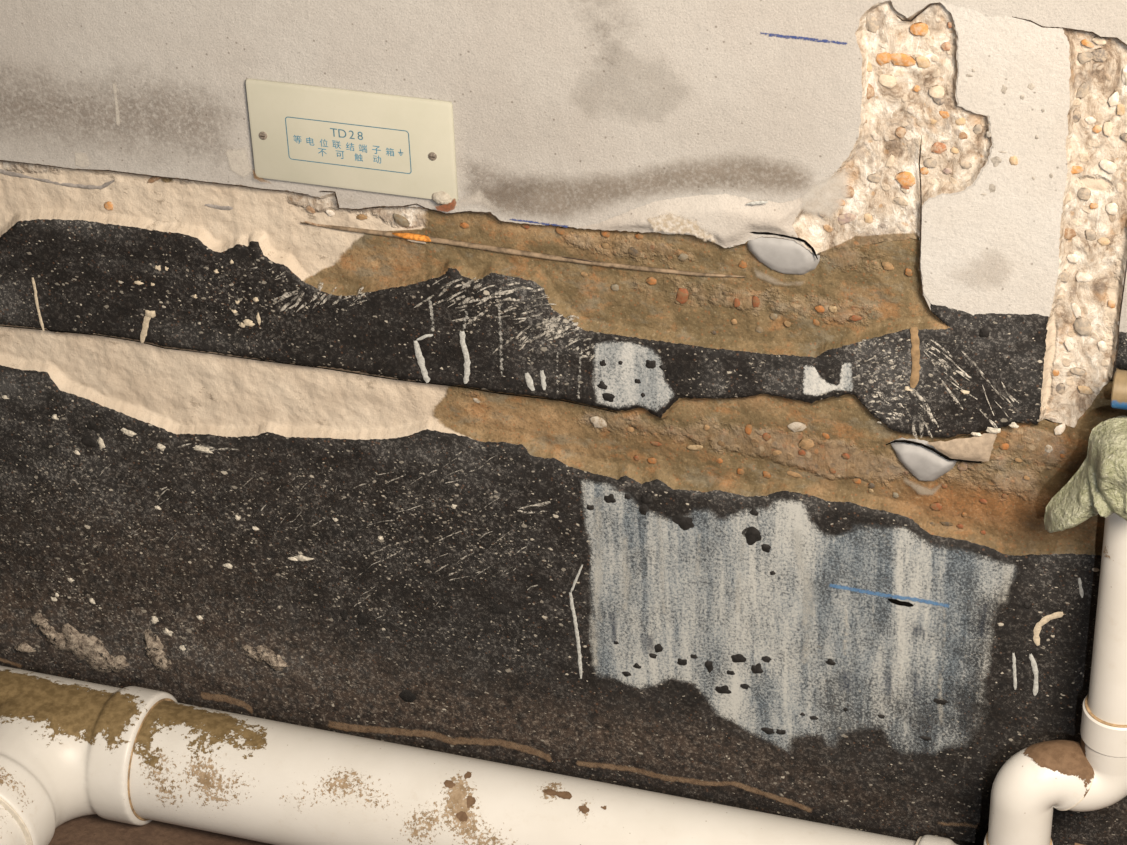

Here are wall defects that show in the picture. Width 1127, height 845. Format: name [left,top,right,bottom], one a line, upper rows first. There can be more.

water stain [226,149,251,177]
water stain [463,164,847,216]
flaking render [792,0,1127,436]
spalling [300,221,746,277]
water stain [581,481,1015,752]